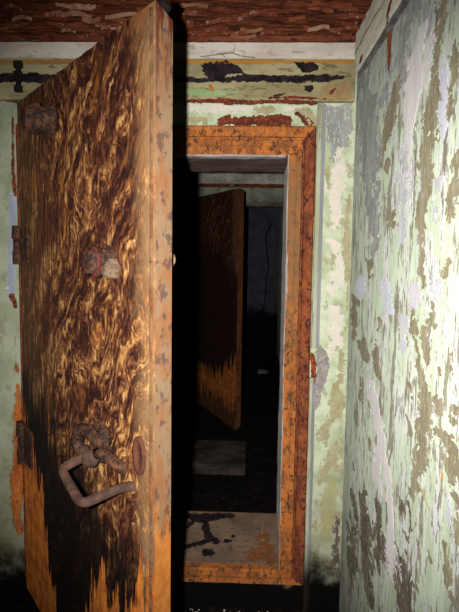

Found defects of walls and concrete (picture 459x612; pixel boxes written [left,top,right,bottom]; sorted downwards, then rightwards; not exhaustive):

peeling [310,0,459,612]